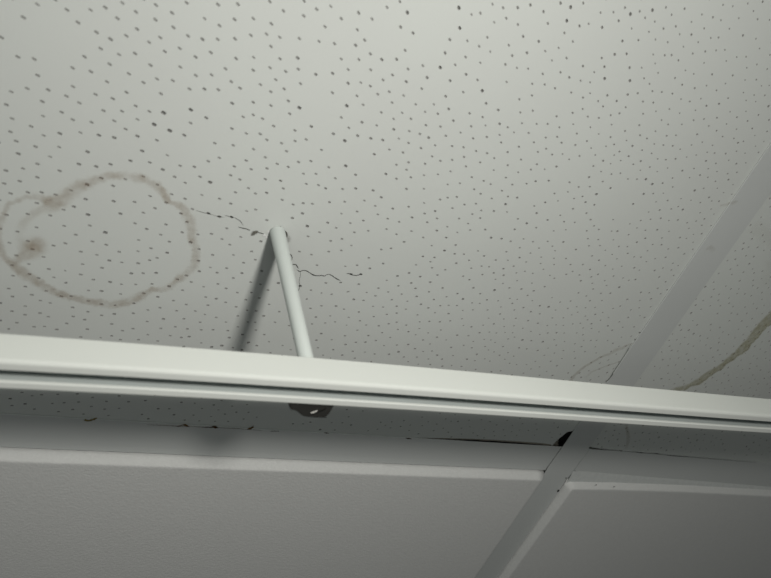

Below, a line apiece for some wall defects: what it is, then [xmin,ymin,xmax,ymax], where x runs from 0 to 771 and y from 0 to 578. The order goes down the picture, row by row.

crack [202,212,263,236]
crack [290,254,362,291]